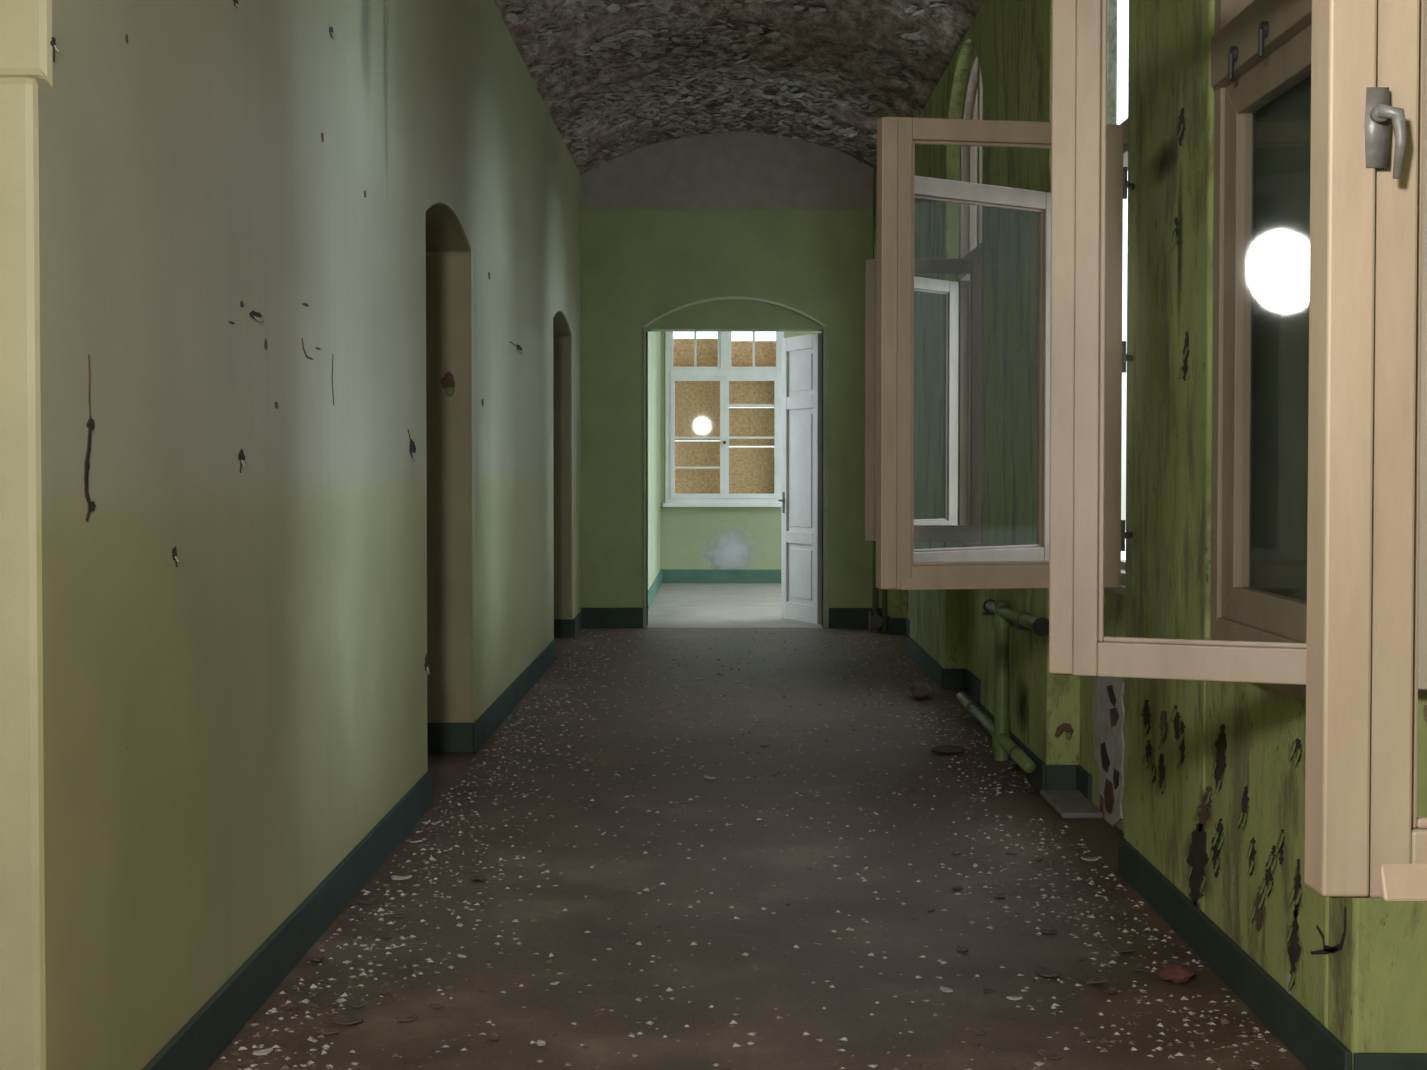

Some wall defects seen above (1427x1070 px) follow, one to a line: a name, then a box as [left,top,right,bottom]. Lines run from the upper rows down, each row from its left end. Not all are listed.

crack [84,354,96,522]
flaking render [708,533,749,569]